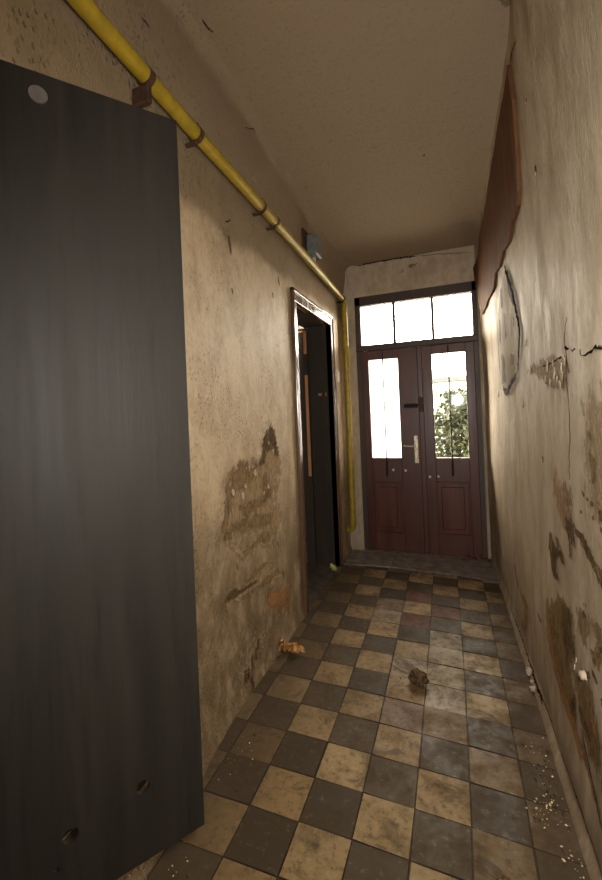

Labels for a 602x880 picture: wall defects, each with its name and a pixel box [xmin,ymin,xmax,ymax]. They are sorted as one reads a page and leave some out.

spalling [527,354,567,390]
crack [542,319,602,480]
leakage [549,388,602,588]
leakage [546,594,602,761]